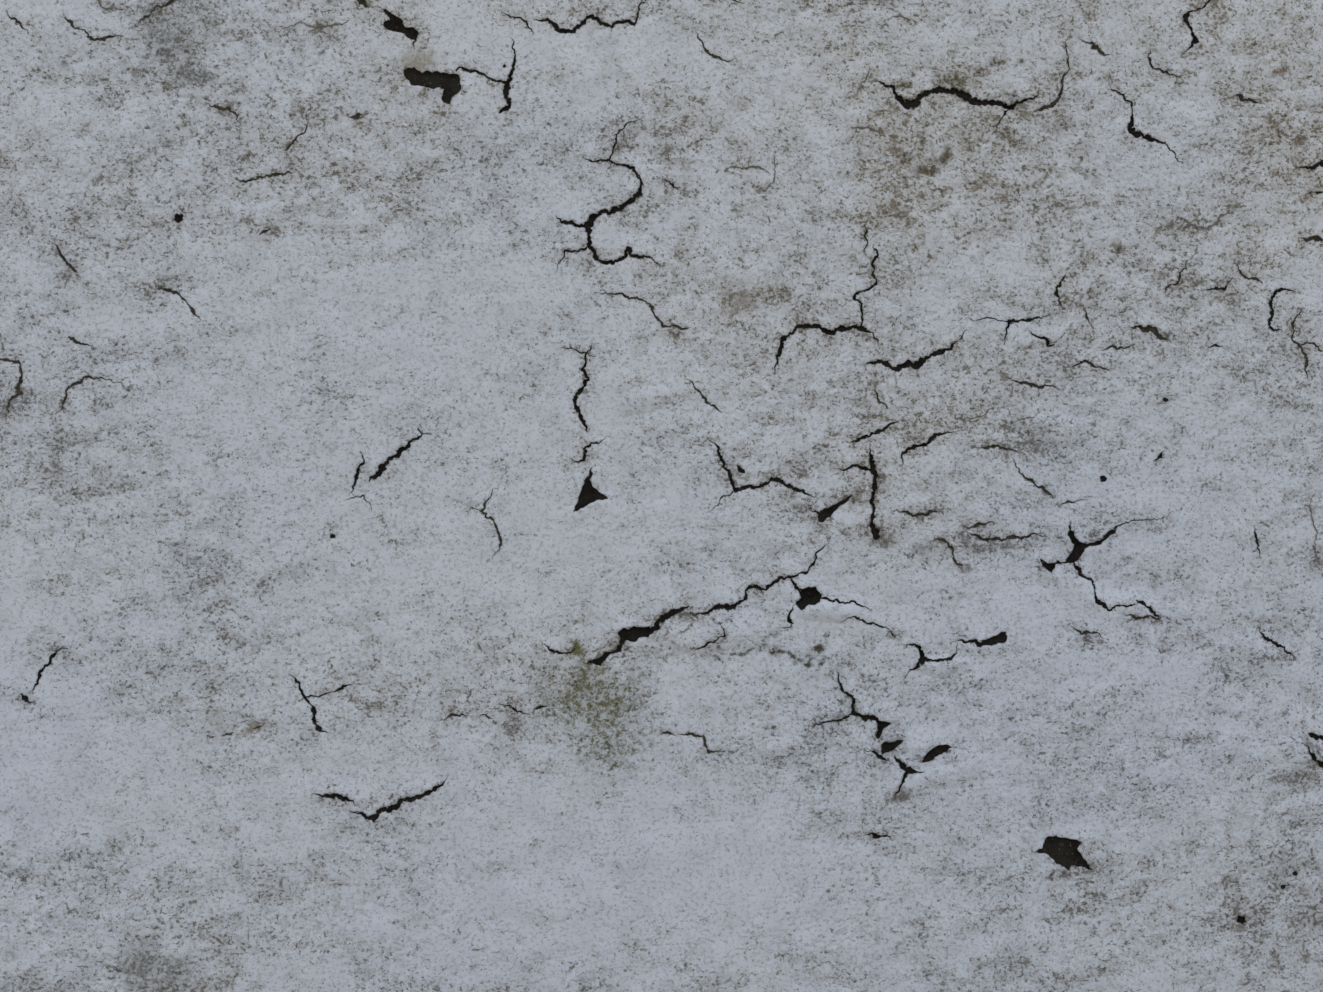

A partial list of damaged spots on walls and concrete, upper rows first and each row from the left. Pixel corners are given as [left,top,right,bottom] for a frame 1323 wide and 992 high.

crack [456,0,646,114]
crack [850,38,1181,162]
crack [555,115,691,330]
crack [343,429,432,511]
crack [541,211,1323,677]
crack [290,674,351,733]
crack [314,776,448,822]
crack [662,731,723,754]
crack [811,670,952,795]
spalling [1036,836,1093,870]